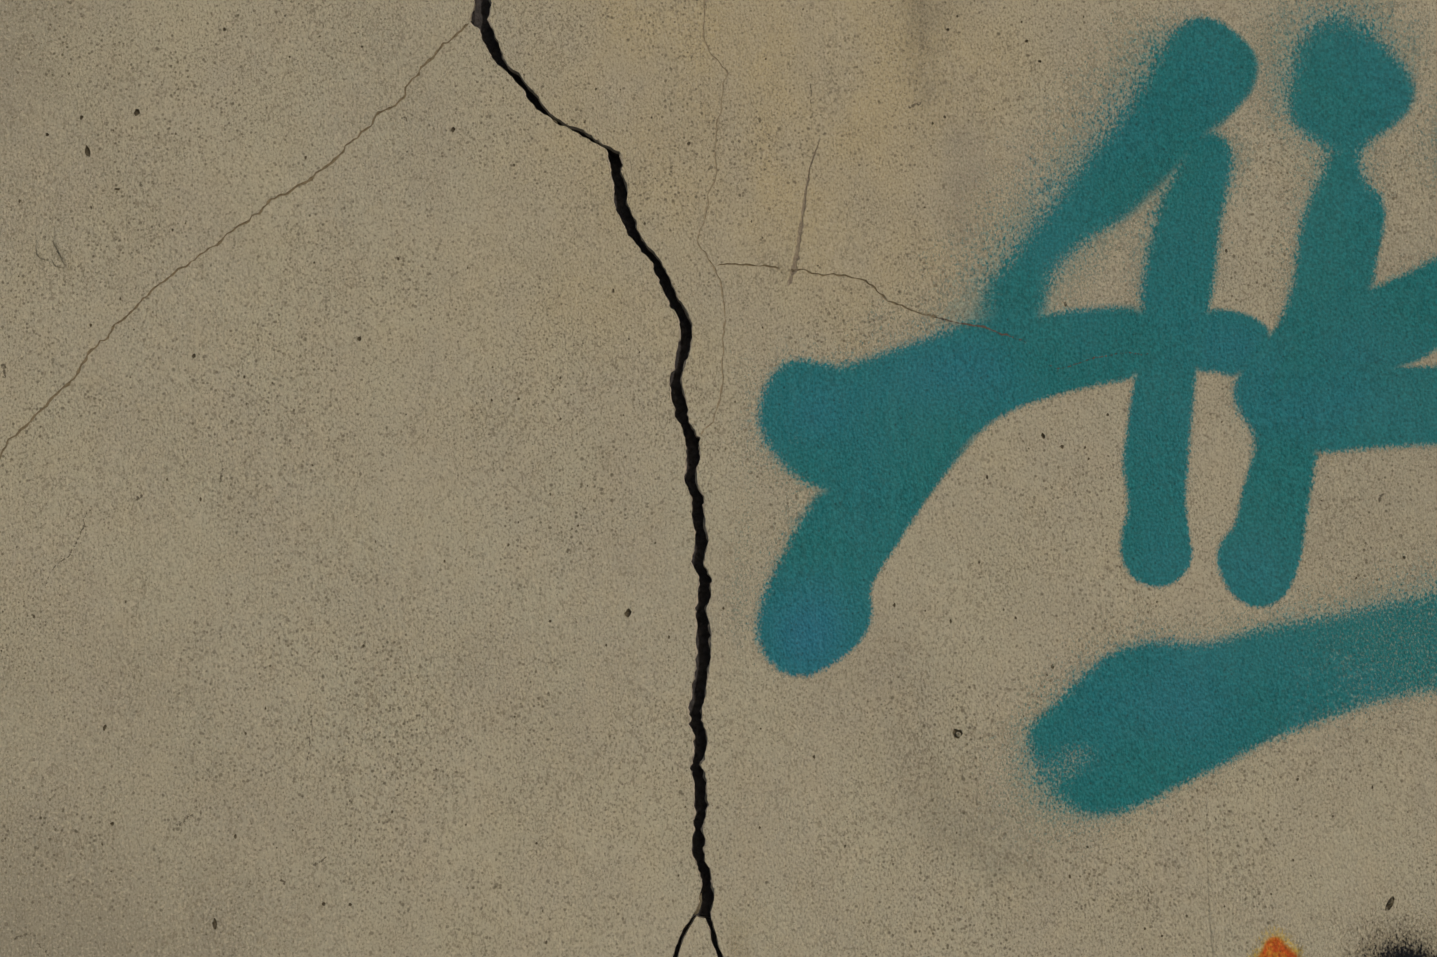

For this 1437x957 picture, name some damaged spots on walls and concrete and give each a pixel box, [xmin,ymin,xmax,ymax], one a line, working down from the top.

crack [0,0,1025,957]